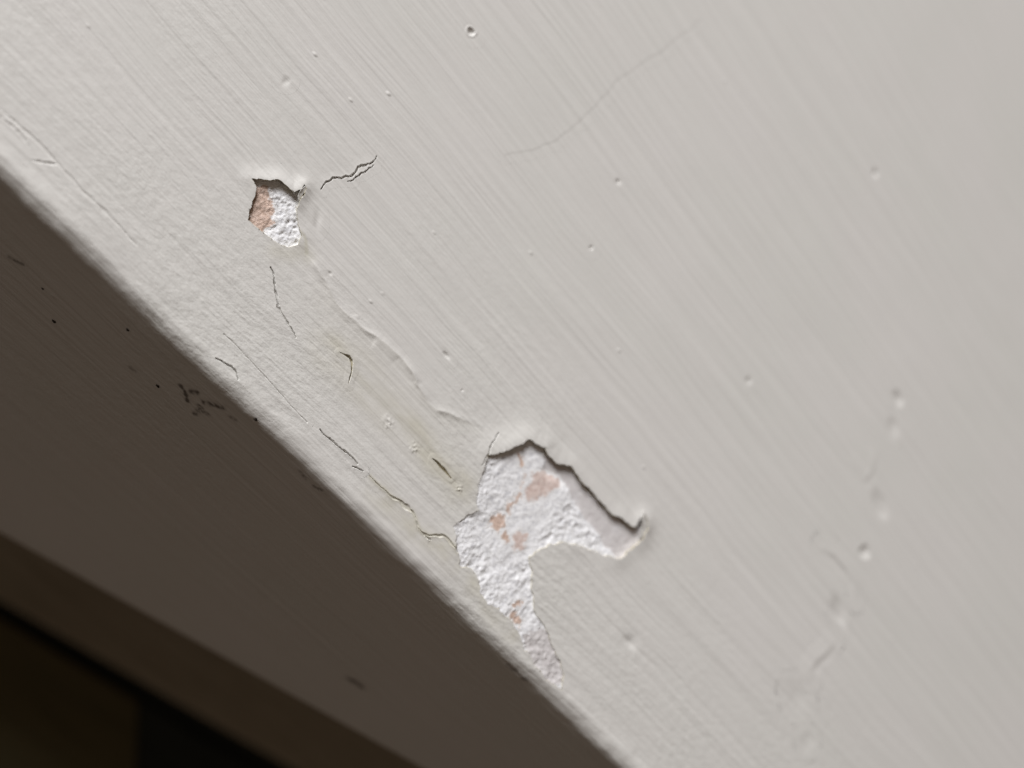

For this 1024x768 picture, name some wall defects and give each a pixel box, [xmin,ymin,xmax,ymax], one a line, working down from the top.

peeling [236,158,318,258]
crack [314,148,385,198]
crack [261,259,305,345]
crack [207,326,460,559]
peeling [426,406,659,699]